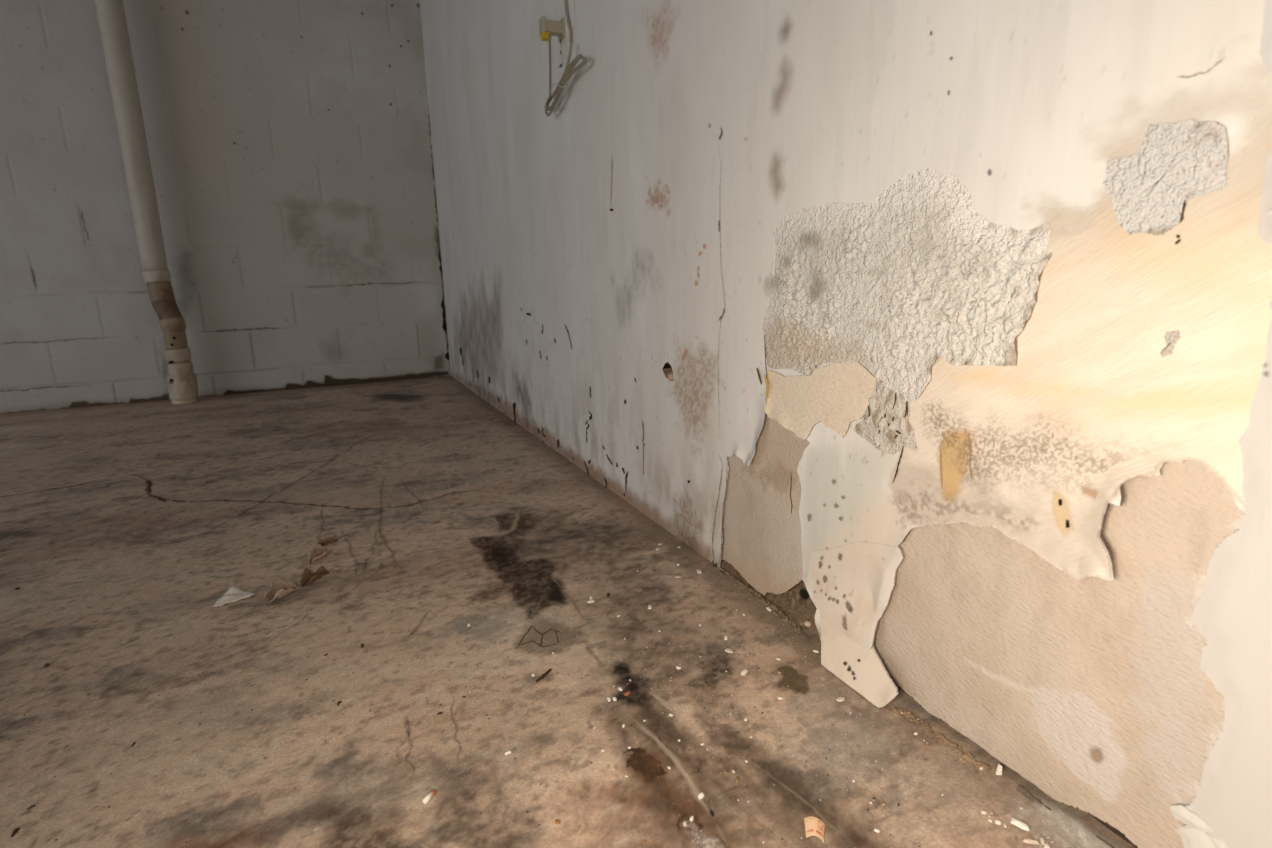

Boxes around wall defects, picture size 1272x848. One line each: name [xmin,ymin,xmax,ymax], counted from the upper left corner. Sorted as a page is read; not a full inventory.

crack [141,477,474,509]
water stain [939,433,971,499]
peeling [719,119,1272,848]